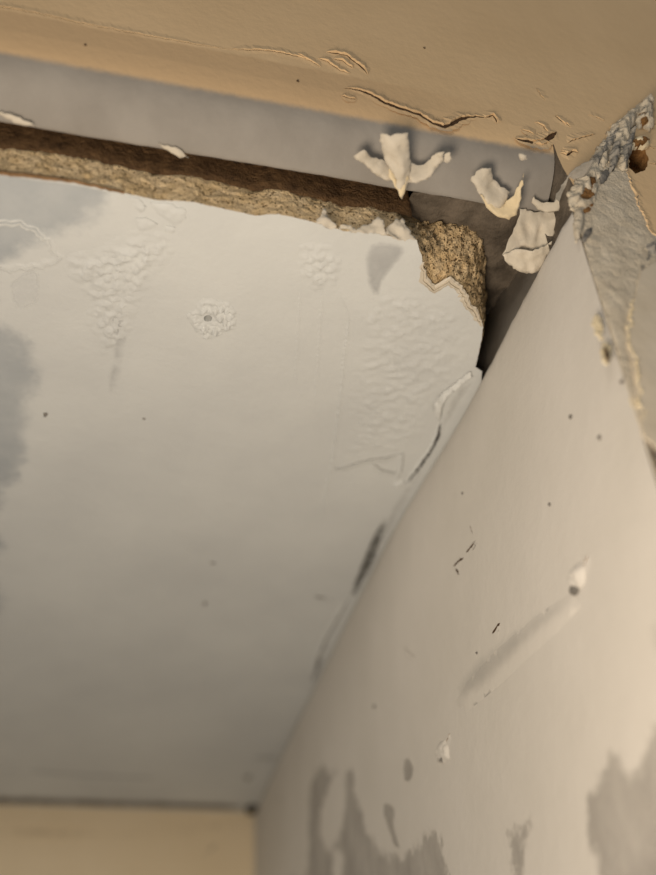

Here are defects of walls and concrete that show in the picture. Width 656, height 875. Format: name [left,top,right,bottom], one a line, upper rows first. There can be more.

peeling [0,112,35,127]
peeling [159,143,189,158]
peeling [353,132,452,199]
crack [341,86,502,131]
crack [515,88,605,160]
spalling [632,98,653,150]
spalling [574,152,656,450]
peeling [393,371,472,487]
damp [353,528,384,593]